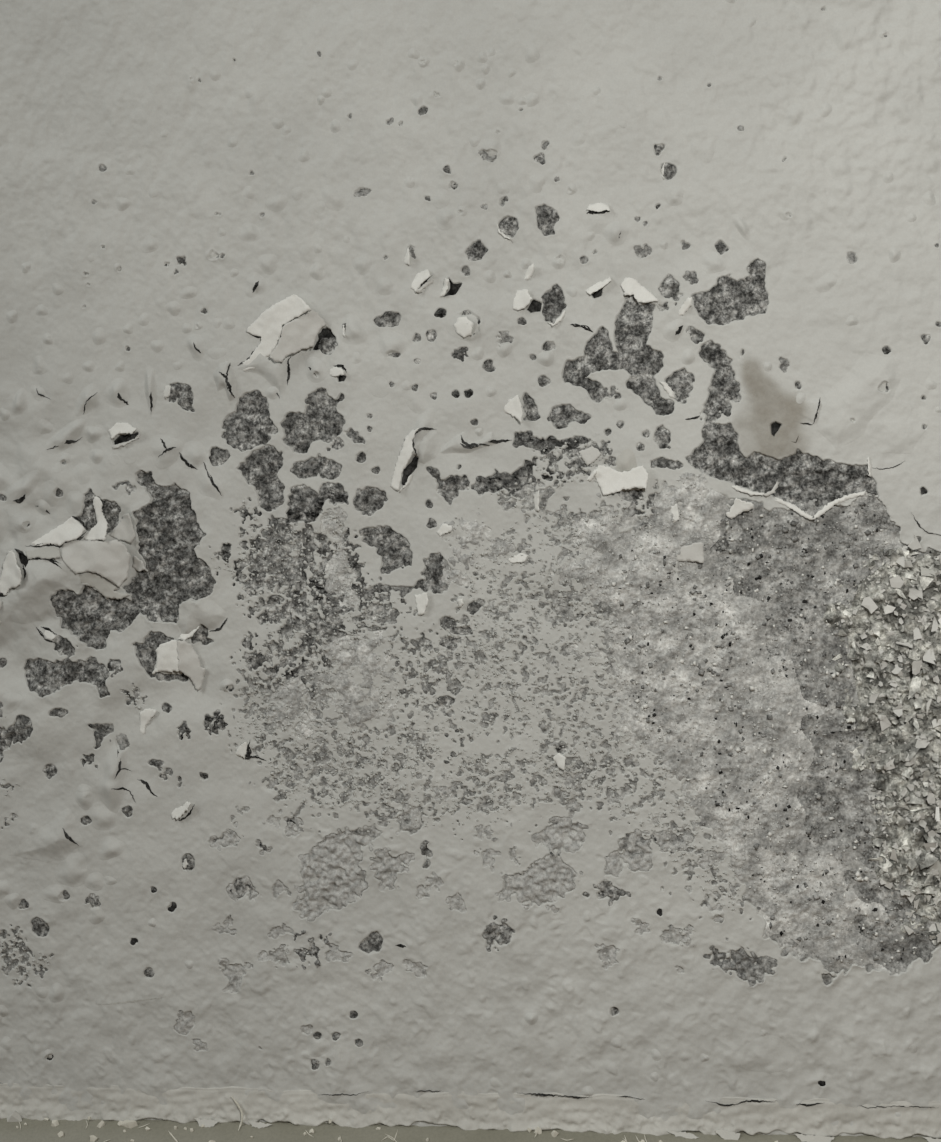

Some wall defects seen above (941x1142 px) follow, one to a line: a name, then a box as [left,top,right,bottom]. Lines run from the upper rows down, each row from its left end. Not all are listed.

peeling [404,240,488,342]
flaking render [0,259,941,993]
crack [523,1092,588,1100]
crack [708,1099,823,1107]